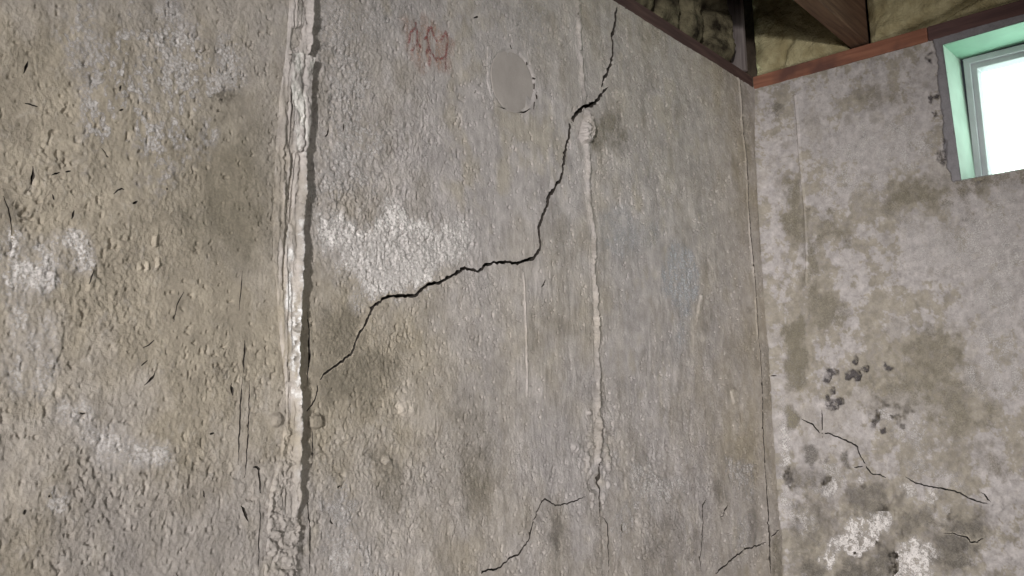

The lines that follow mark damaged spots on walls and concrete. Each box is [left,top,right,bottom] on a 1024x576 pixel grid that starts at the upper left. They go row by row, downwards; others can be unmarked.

crack [307,8,617,468]
damp [909,174,1024,423]
crack [305,502,313,574]
crack [481,463,609,574]
damp [778,398,864,534]
damp [803,511,982,576]
crack [802,414,991,504]
damp [875,362,962,515]